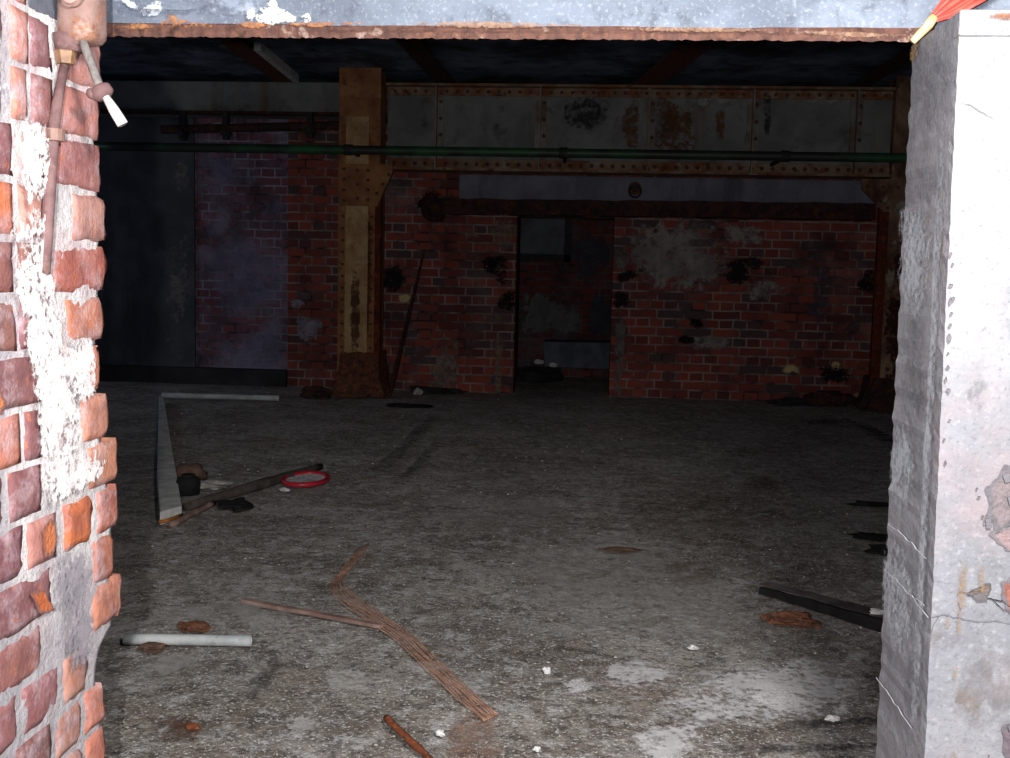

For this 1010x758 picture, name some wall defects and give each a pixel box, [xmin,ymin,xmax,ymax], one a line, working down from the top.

peeling [122,0,163,16]
corrosion [122,14,212,29]
corrosion [350,222,372,352]
leakage [615,220,769,291]
corrosion [883,242,903,380]
spalling [976,465,1010,551]
spalling [967,577,1010,613]